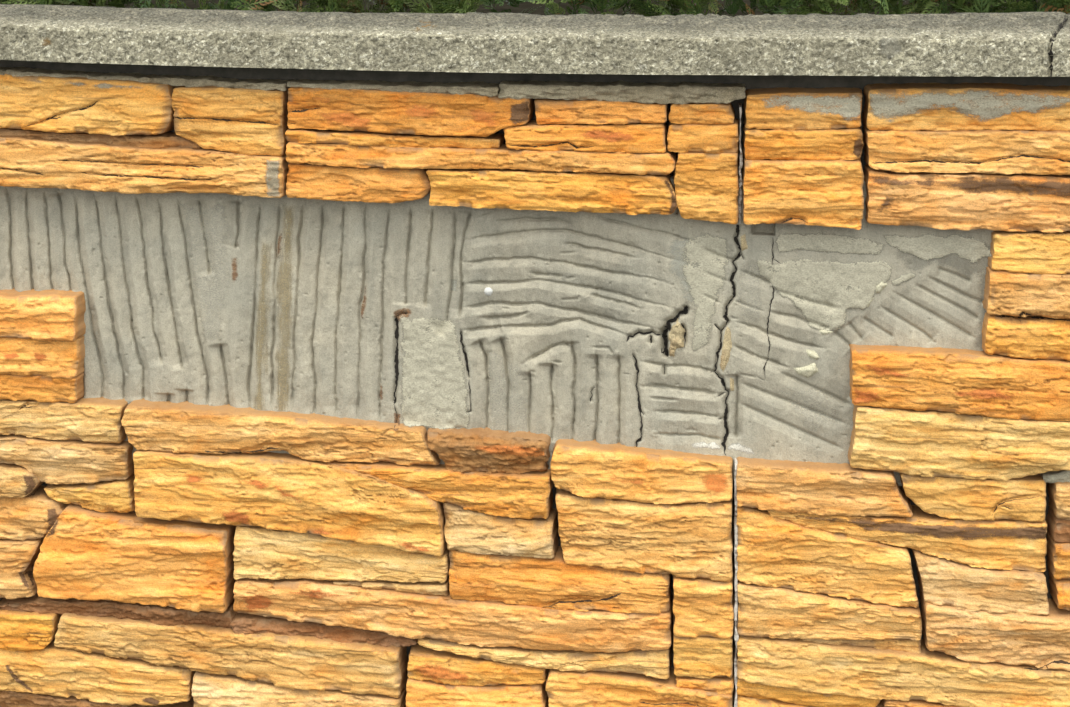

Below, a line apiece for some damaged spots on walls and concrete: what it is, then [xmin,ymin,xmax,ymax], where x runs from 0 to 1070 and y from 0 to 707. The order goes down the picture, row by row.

crack [1048,18,1068,77]
peeling [776,233,884,255]
crack [760,217,804,380]
spalling [668,318,686,357]
spalling [720,327,734,391]
crack [713,225,744,455]